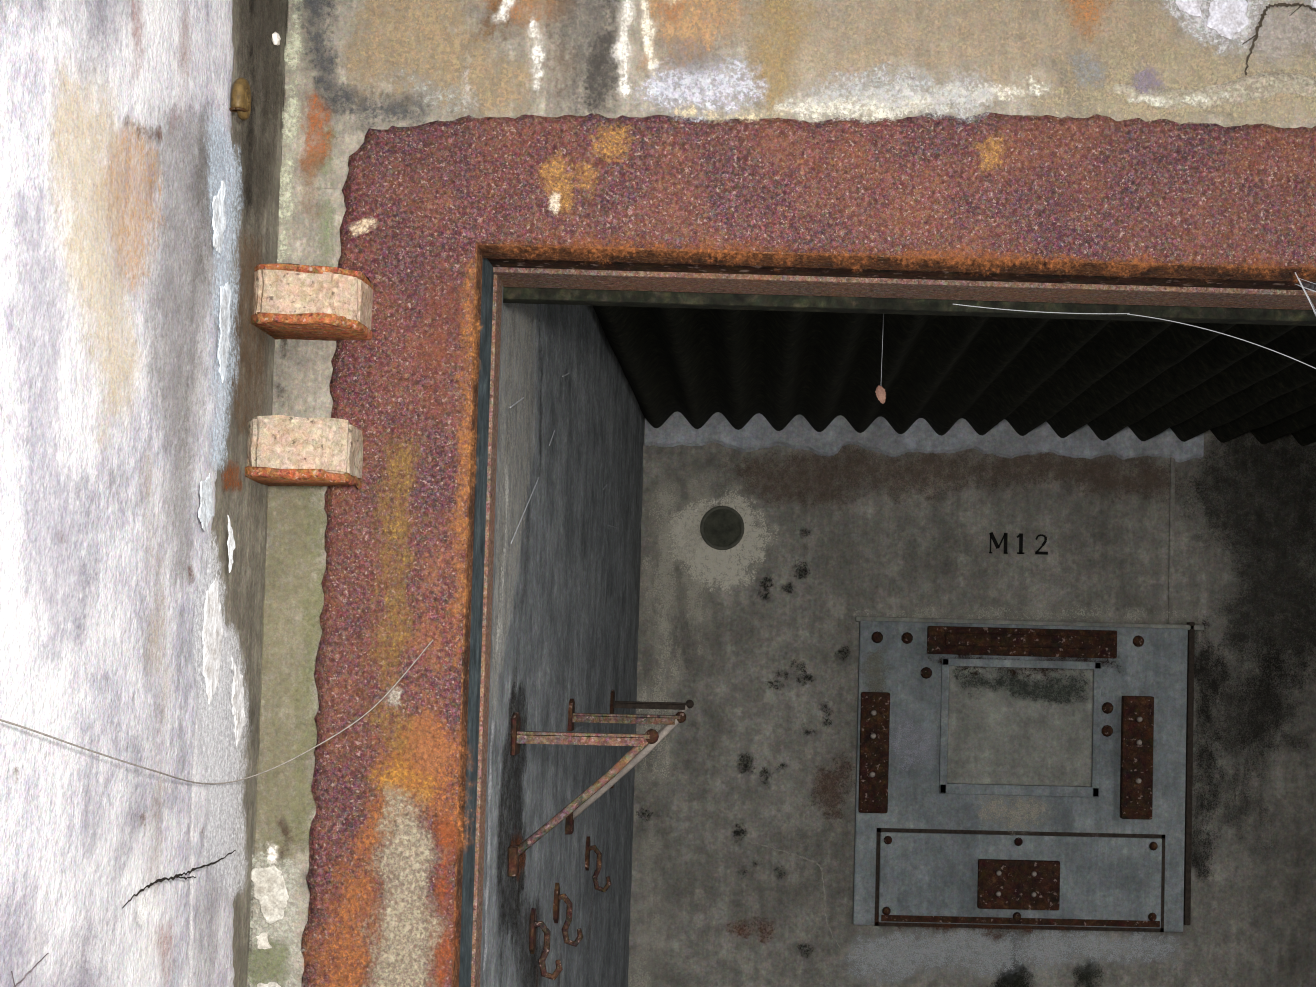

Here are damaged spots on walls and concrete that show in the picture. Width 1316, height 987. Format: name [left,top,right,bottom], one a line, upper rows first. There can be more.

damp [497,0,514,21]
damp [529,0,1316,126]
crack [1242,2,1316,75]
rust [540,159,597,211]
damp [55,0,478,573]
rust [350,219,374,235]
rust [898,248,1084,271]
rust [316,269,479,987]
damp [483,682,543,987]
crack [122,850,235,909]
peeling [370,789,444,987]
rust [876,915,1160,939]